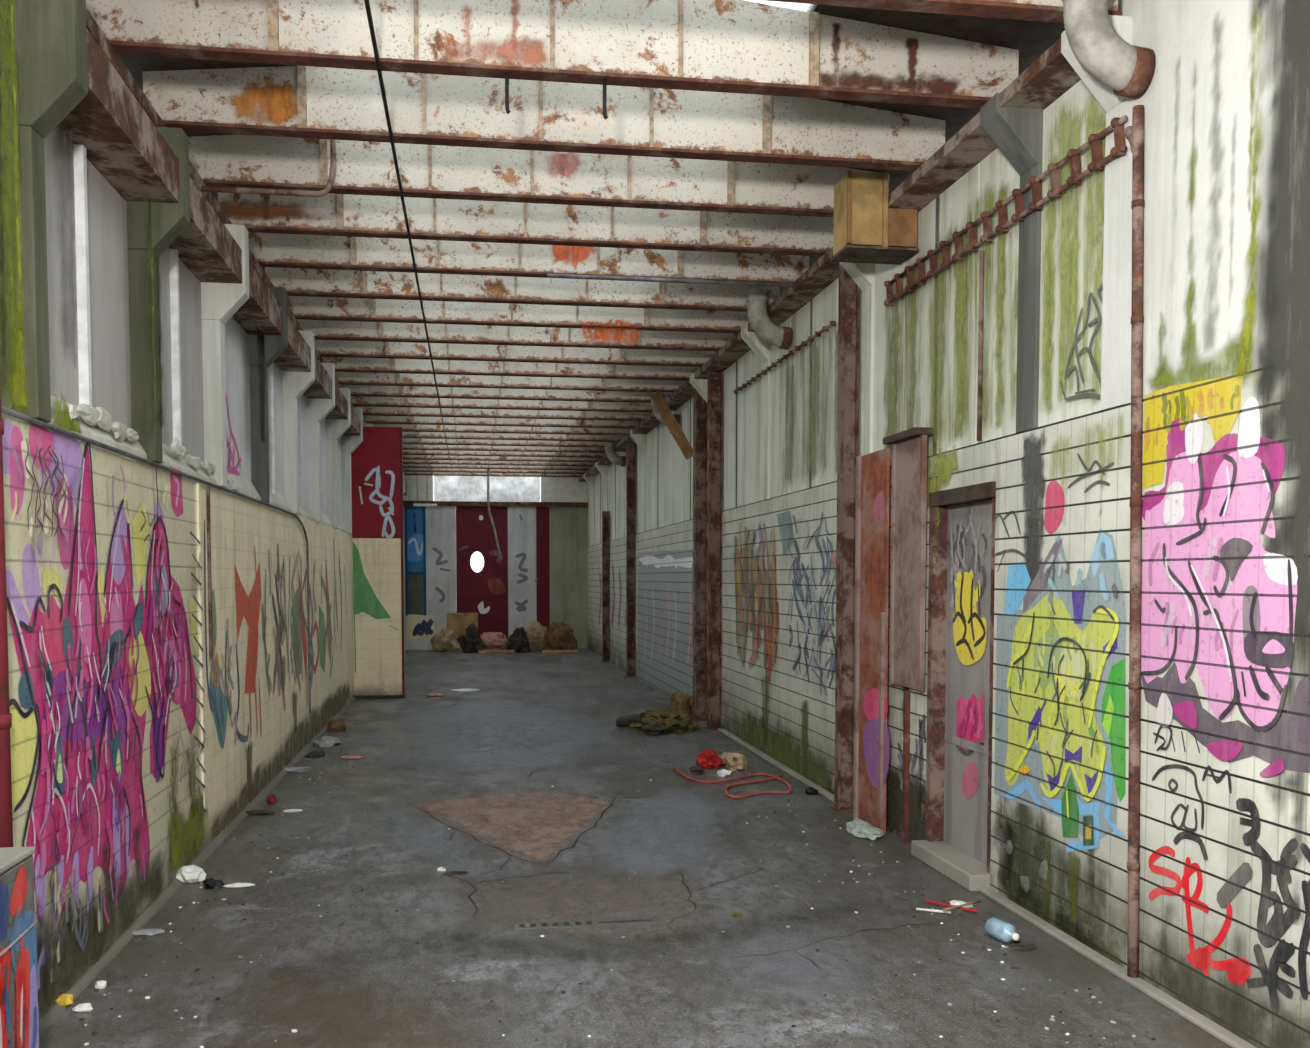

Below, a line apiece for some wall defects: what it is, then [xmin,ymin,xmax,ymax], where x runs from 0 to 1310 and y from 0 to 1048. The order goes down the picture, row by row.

rust [231,78,298,125]
rust [452,0,546,64]
rust [819,23,957,95]
damp [0,80,22,347]
rust [219,194,308,220]
damp [1095,126,1105,295]
damp [1047,184,1078,410]
damp [1249,0,1310,697]
damp [37,828,162,1009]
damp [212,685,349,840]
damp [997,798,1106,950]
damp [1278,771,1304,859]